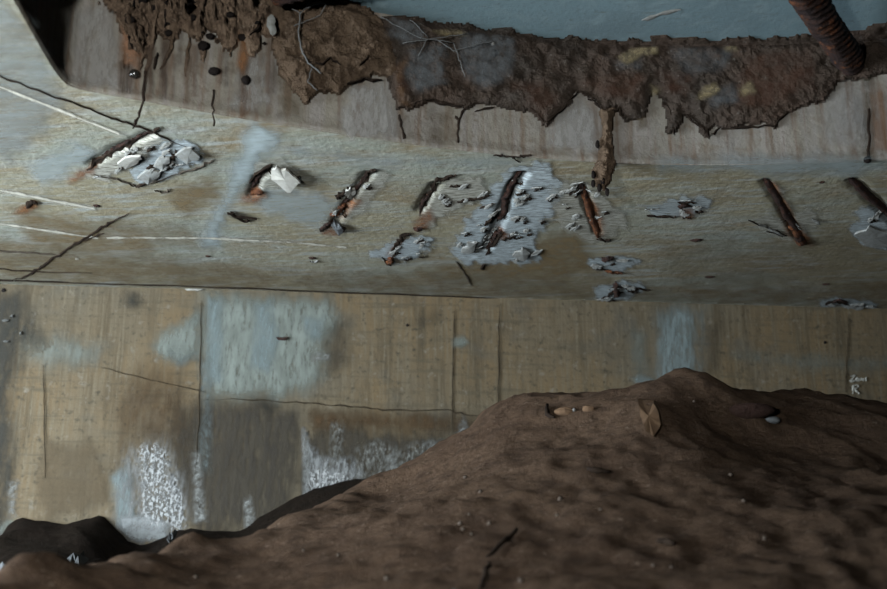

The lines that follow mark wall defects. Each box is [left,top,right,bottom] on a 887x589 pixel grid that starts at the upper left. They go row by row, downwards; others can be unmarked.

peeling [254,14,276,45]
crack [0,71,213,194]
spalling [72,127,204,188]
spalling [243,159,300,201]
spalling [319,168,388,236]
spalling [369,160,627,270]
spalling [848,177,887,250]
crack [0,213,508,402]
spalling [588,256,649,302]
crack [40,377,48,468]
crack [101,317,476,474]
damp [113,294,472,541]